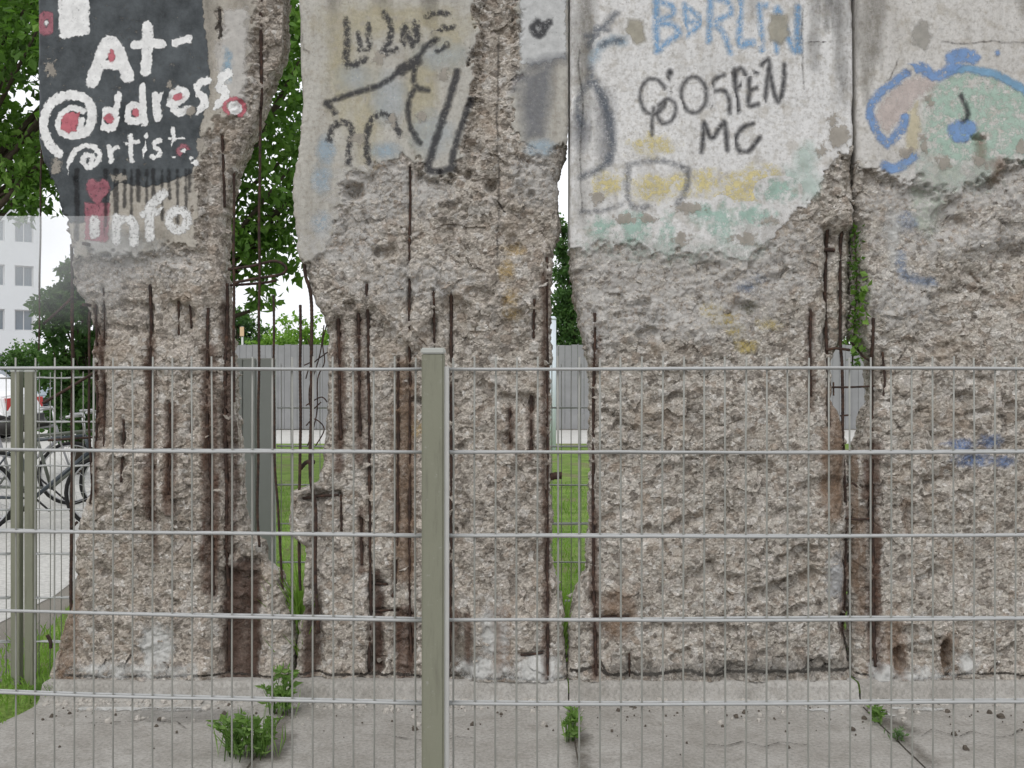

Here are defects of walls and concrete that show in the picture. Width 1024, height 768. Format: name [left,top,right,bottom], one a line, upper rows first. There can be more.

corrosion [94,325,104,495]
corrosion [144,418,171,520]
spalling [42,0,404,682]
corrosion [203,303,259,678]
spalling [289,0,1024,682]
corrosion [370,571,382,672]
corrosion [396,608,412,678]